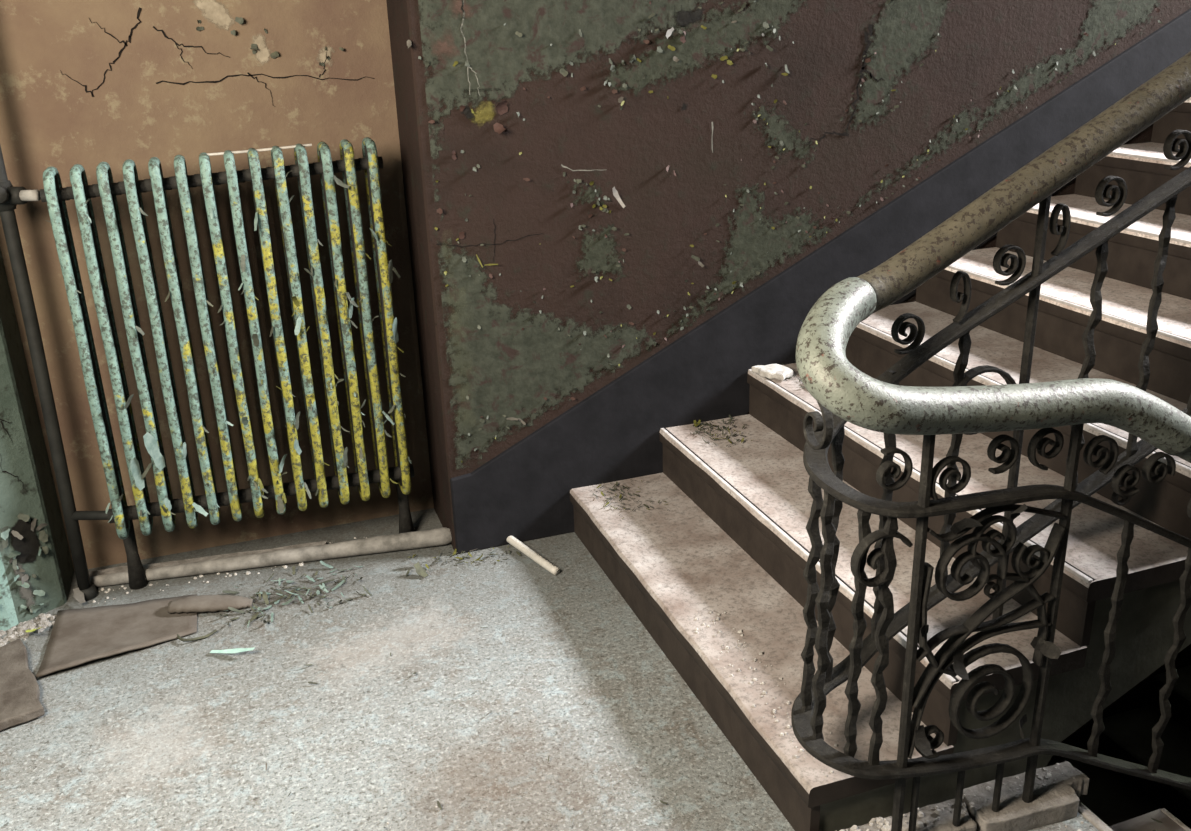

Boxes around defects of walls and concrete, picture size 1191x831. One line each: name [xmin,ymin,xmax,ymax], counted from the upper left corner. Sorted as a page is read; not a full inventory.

crack [60,7,374,107]
peeling [407,0,1163,469]
peeling [0,513,49,613]